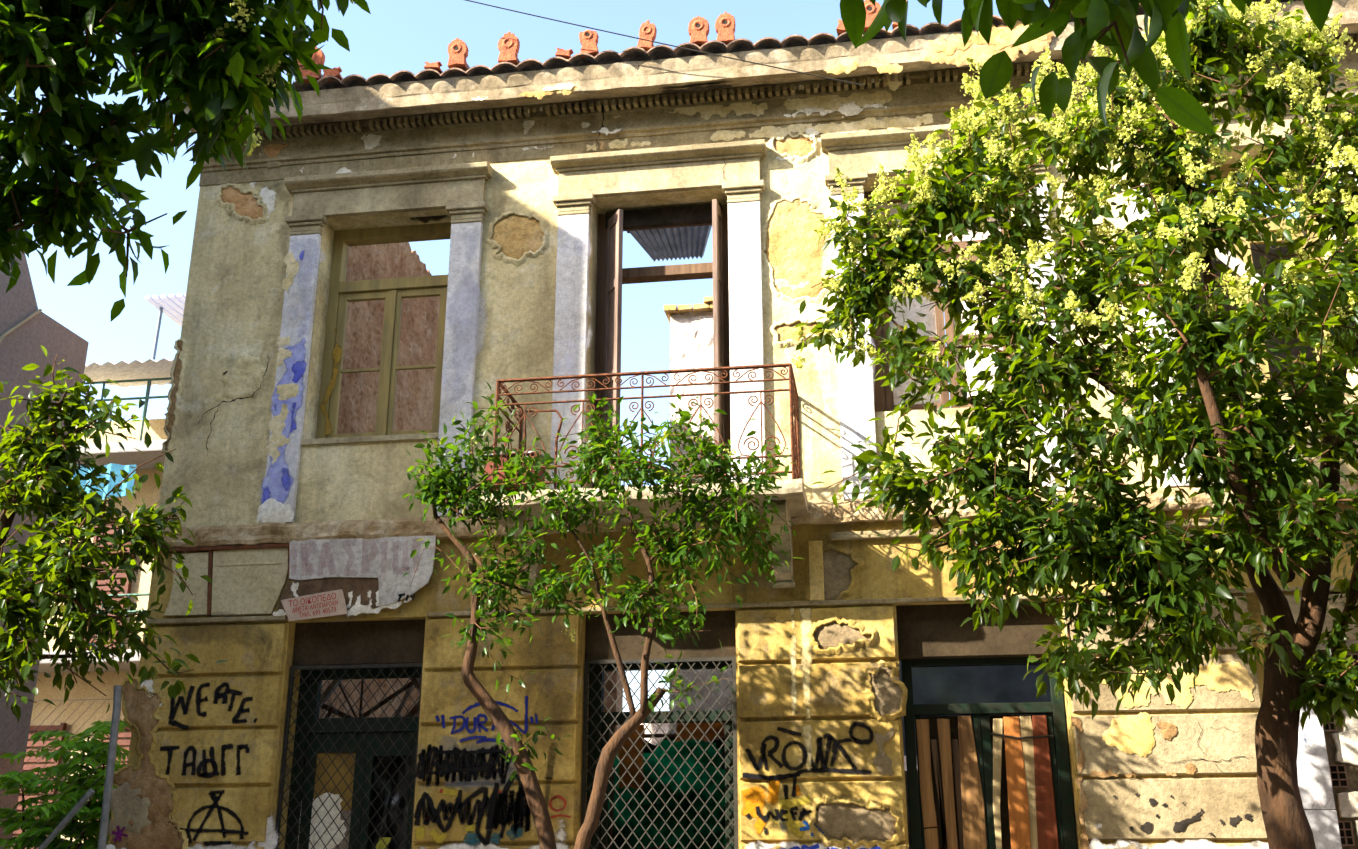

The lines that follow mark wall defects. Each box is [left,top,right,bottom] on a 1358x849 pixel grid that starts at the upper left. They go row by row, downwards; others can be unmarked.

spalling [923,20,1054,67]
peeling [668,61,933,164]
spalling [485,210,550,267]
spalling [761,194,834,349]
crack [198,355,269,457]
peeling [257,336,307,523]
spalling [804,544,878,656]
spalling [106,675,278,849]
peeling [297,793,346,849]
spalling [862,660,908,776]
peeling [1071,716,1269,849]
peeling [1102,661,1255,757]